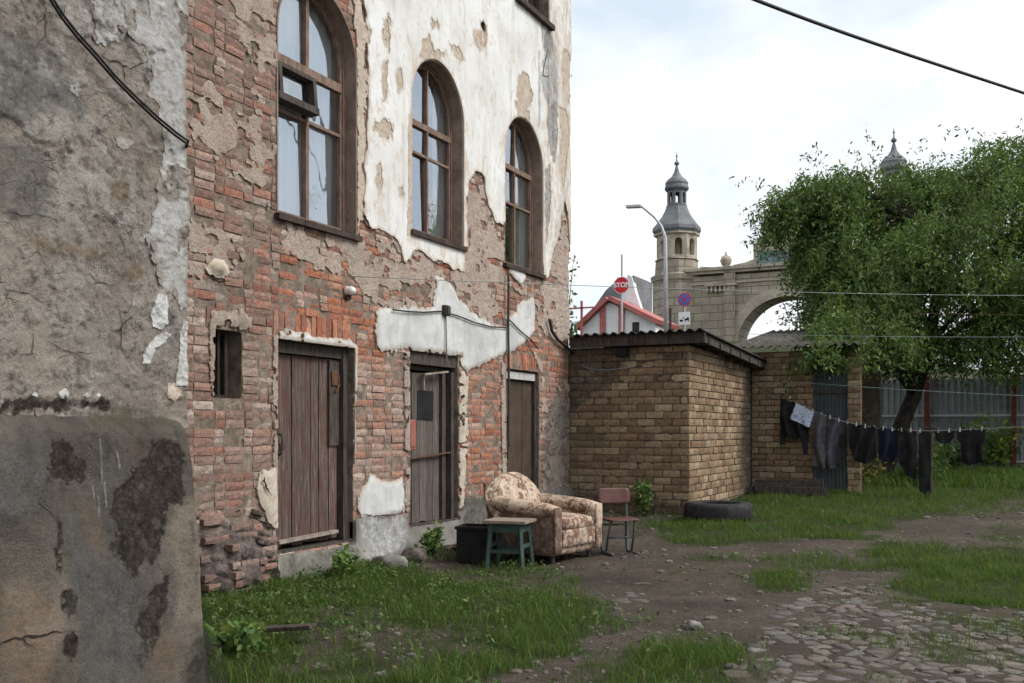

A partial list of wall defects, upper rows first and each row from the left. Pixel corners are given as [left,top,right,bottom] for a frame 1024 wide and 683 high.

peeling [91,0,278,402]
flaking render [256,328,358,529]
flaking render [280,0,577,560]
crack [0,631,79,650]